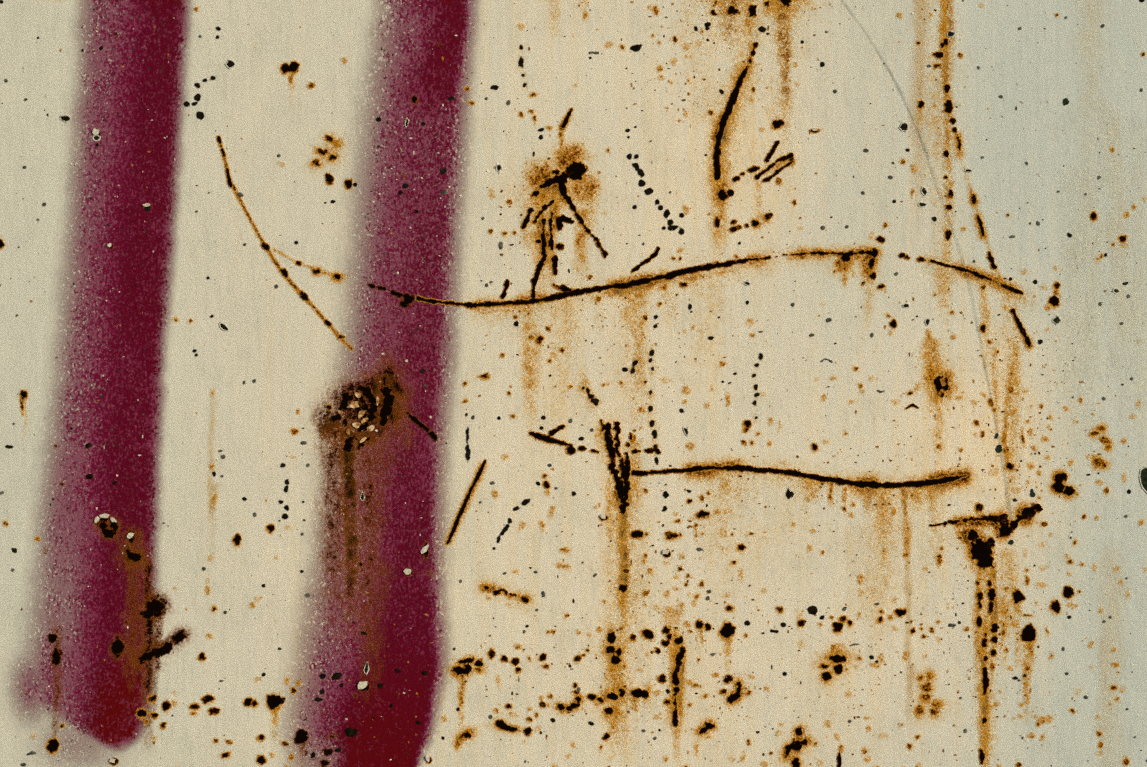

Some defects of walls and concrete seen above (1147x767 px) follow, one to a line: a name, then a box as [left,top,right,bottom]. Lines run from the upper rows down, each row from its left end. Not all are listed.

corrosion [710,0,813,126]
corrosion [488,92,609,299]
corrosion [916,0,1083,767]
corrosion [296,359,438,645]
corrosion [1087,424,1127,494]
peeling [1138,466,1147,494]
corrosion [123,534,190,741]
corrosion [442,654,500,750]
corrosion [489,420,718,767]
corrosion [726,674,769,706]
corrosion [761,723,818,767]
corrosion [817,643,884,685]